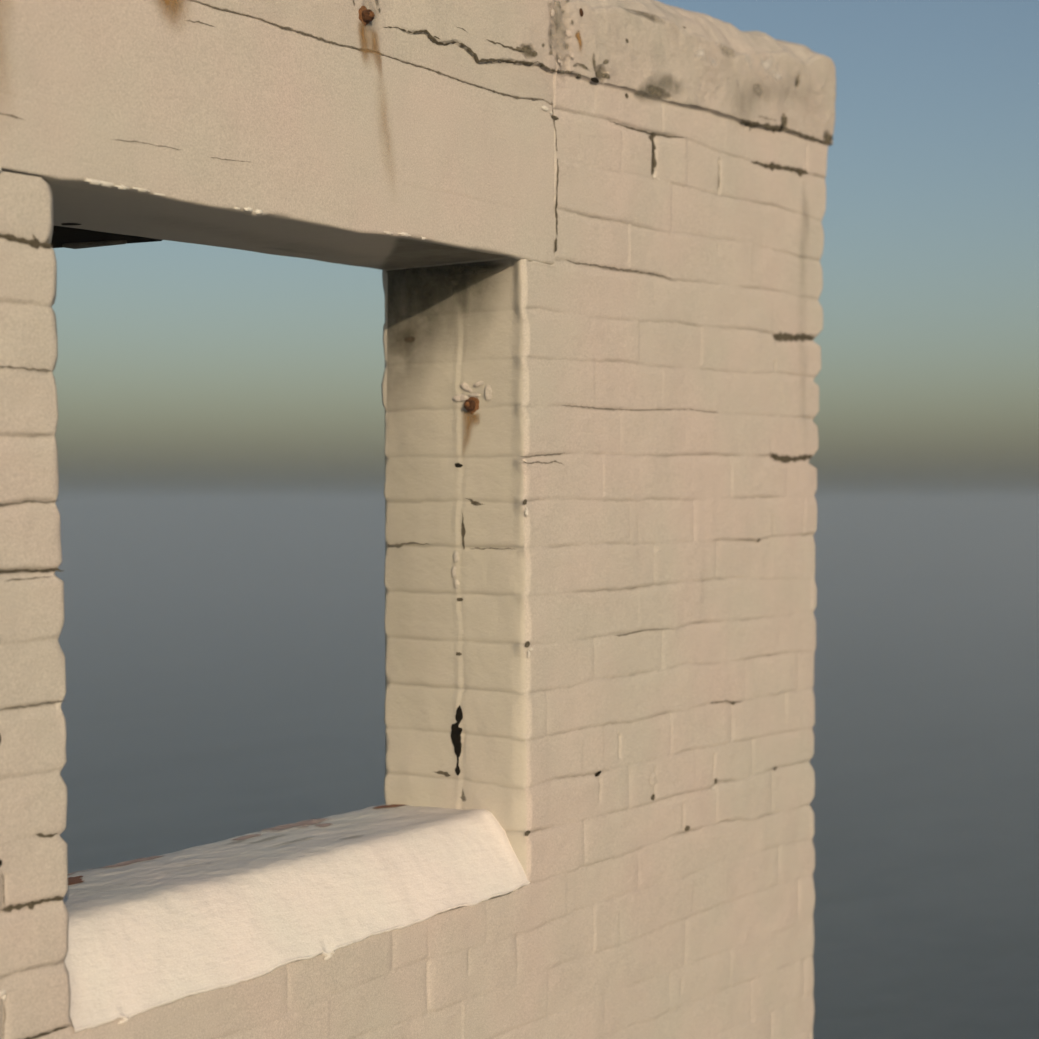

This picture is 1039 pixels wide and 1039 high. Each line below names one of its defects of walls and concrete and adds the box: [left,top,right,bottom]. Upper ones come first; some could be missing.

rust [361,24,380,60]
spalling [516,0,610,80]
crack [188,3,671,279]
crack [610,121,687,175]
crack [740,116,833,145]
crack [751,161,809,176]
water stain [386,246,500,348]
crack [774,332,815,342]
crack [771,452,812,463]
crack [436,705,465,801]
peeling [68,856,161,885]